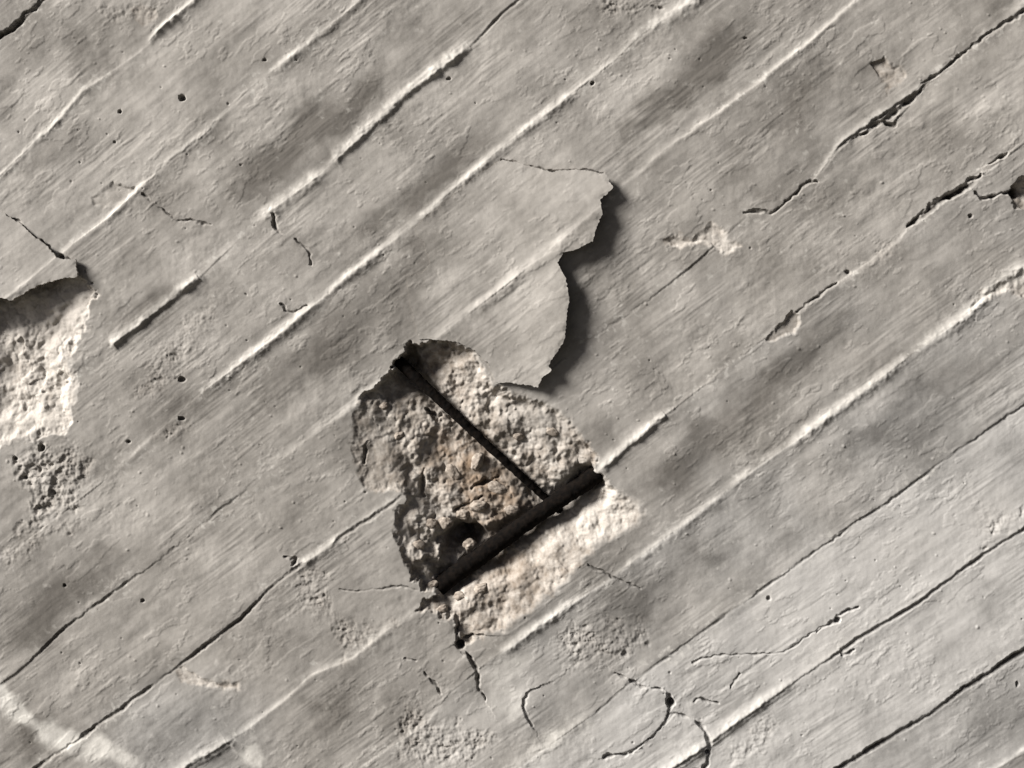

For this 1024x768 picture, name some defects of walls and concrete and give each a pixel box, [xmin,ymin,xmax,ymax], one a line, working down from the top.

crack [852,8,1024,141]
crack [0,209,72,259]
crack [141,192,214,227]
crack [742,178,820,216]
crack [906,152,1010,230]
spalling [0,211,101,452]
crack [796,282,839,315]
spalling [346,160,648,647]
corrosion [414,416,538,541]
crack [454,620,487,702]
crack [522,685,542,728]
crack [602,605,861,768]